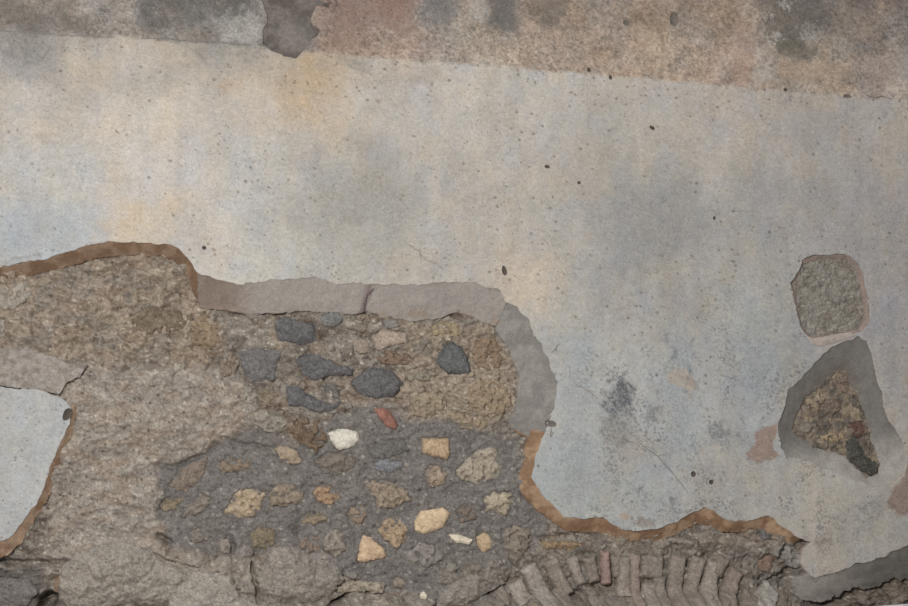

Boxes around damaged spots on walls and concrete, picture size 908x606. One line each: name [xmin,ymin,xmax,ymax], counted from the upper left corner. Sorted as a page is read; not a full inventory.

water stain [0,0,122,69]
water stain [132,0,272,72]
spalling [261,0,329,59]
water stain [416,0,574,46]
spalling [0,241,908,606]